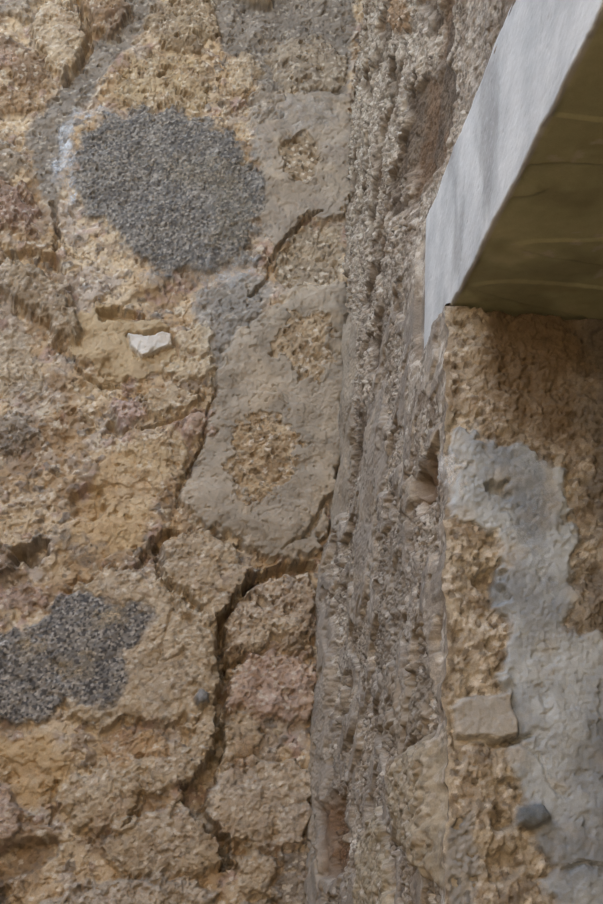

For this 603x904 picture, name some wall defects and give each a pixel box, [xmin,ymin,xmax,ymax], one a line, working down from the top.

crack [247,209,324,298]
crack [135,367,218,664]
crack [177,496,327,873]